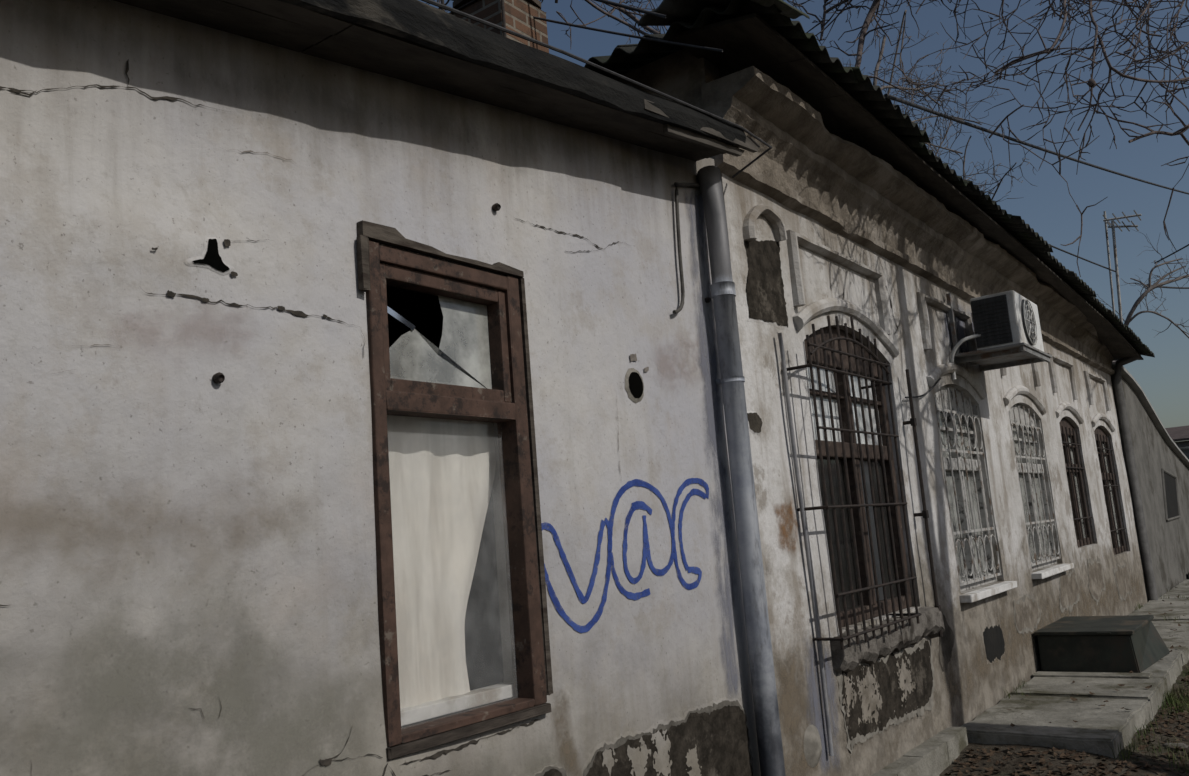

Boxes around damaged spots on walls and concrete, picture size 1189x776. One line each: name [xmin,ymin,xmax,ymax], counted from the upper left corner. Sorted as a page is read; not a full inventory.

crack [0,59,228,112]
crack [515,218,631,253]
crack [144,290,365,358]
spalling [834,610,955,757]
peeling [511,697,753,776]